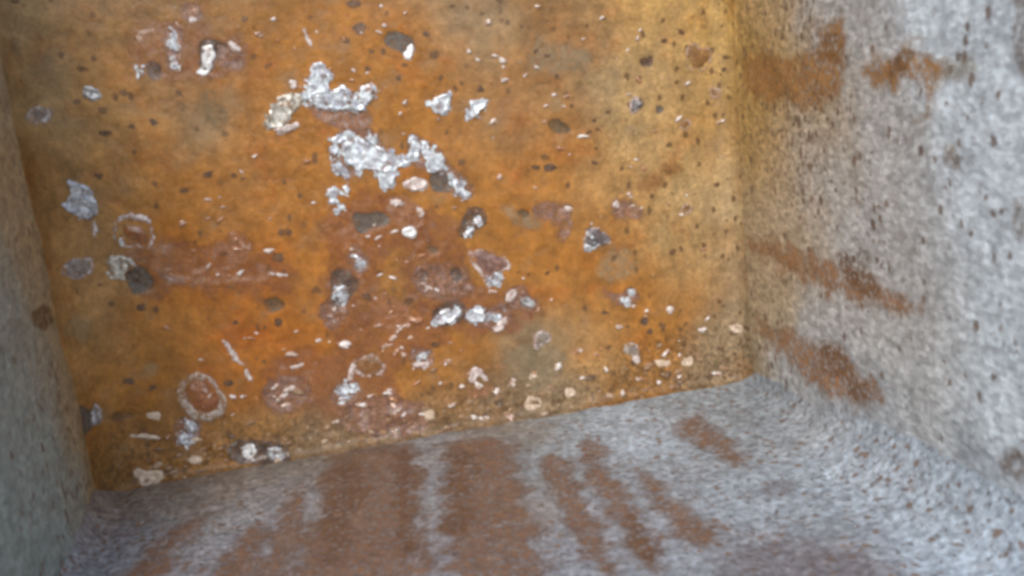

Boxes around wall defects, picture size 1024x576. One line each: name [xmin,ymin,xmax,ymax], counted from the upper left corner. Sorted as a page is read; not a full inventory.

peeling [197,40,245,75]
corrosion [746,20,845,108]
corrosion [865,48,946,95]
peeling [61,173,103,221]
peeling [262,62,489,327]
peeling [412,246,539,332]
corrosion [748,241,912,316]
corrosion [761,325,883,403]
peeling [227,440,290,465]
corrosion [434,437,551,576]
corrosion [541,440,661,574]
corrosion [641,475,715,545]